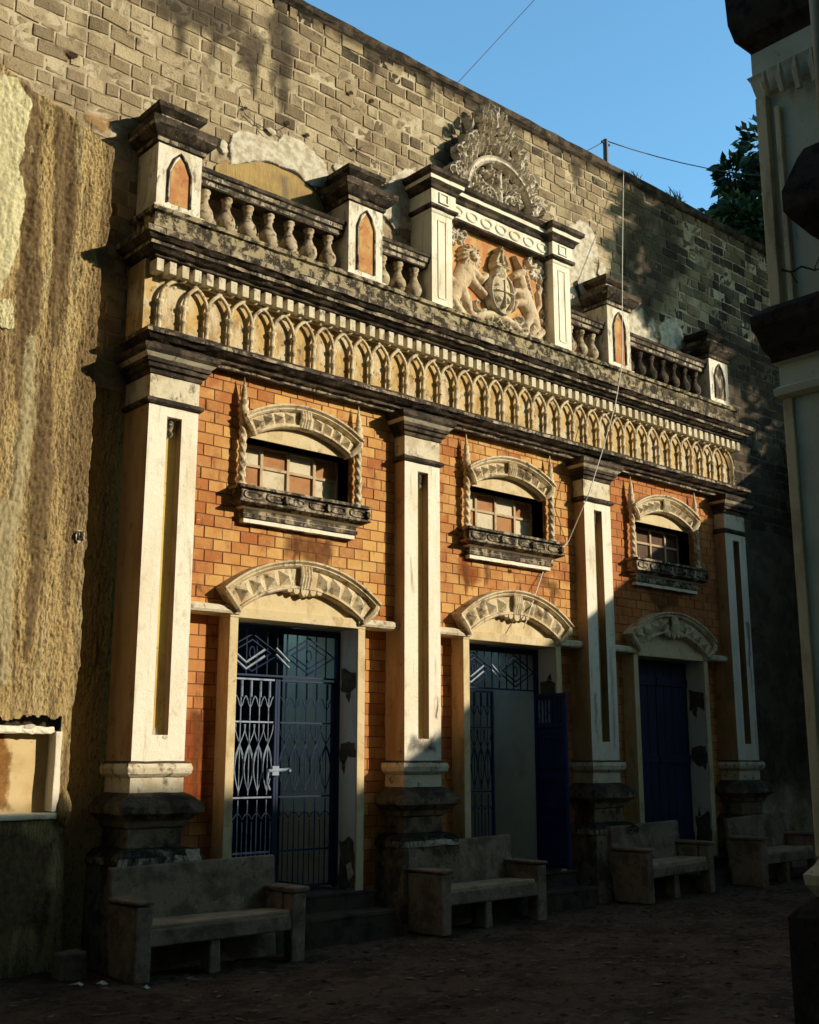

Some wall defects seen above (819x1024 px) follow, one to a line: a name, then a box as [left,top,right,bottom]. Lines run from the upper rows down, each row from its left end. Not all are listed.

water stain [161,0,293,112]
peeling [215,121,342,212]
flaking render [212,200,323,244]
water stain [0,82,77,685]
peeling [341,668,356,702]
peeling [689,690,704,718]
peeling [339,742,356,774]
peeling [691,745,708,770]
peeling [695,808,712,841]
peeling [337,836,355,890]